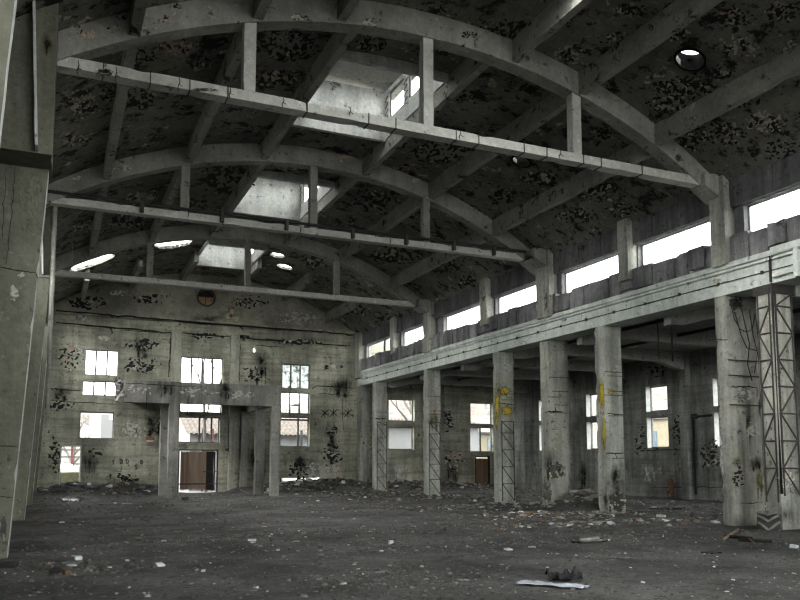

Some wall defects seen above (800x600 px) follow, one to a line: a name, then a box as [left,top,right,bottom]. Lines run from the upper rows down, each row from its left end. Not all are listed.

crack [1,169,38,279]
spalling [541,460,565,503]